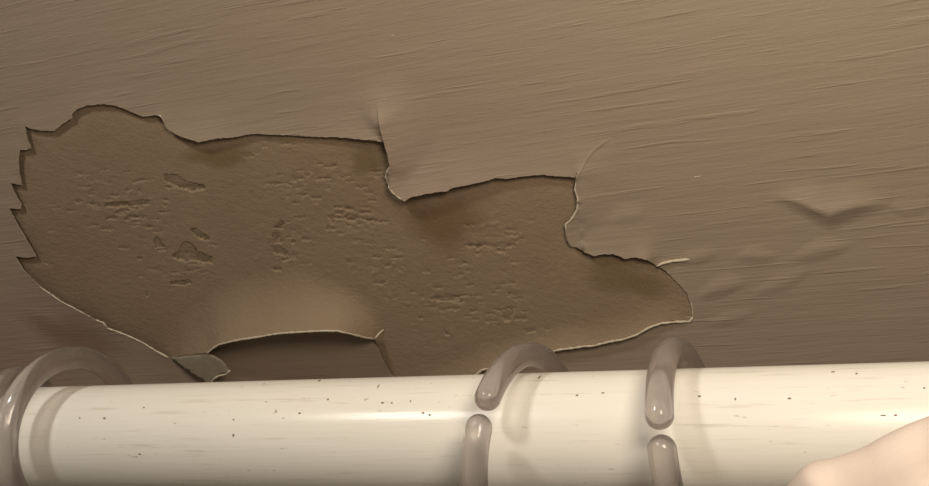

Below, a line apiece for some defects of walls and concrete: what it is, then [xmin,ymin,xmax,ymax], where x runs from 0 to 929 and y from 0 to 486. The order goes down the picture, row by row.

peeling [0,34,758,386]